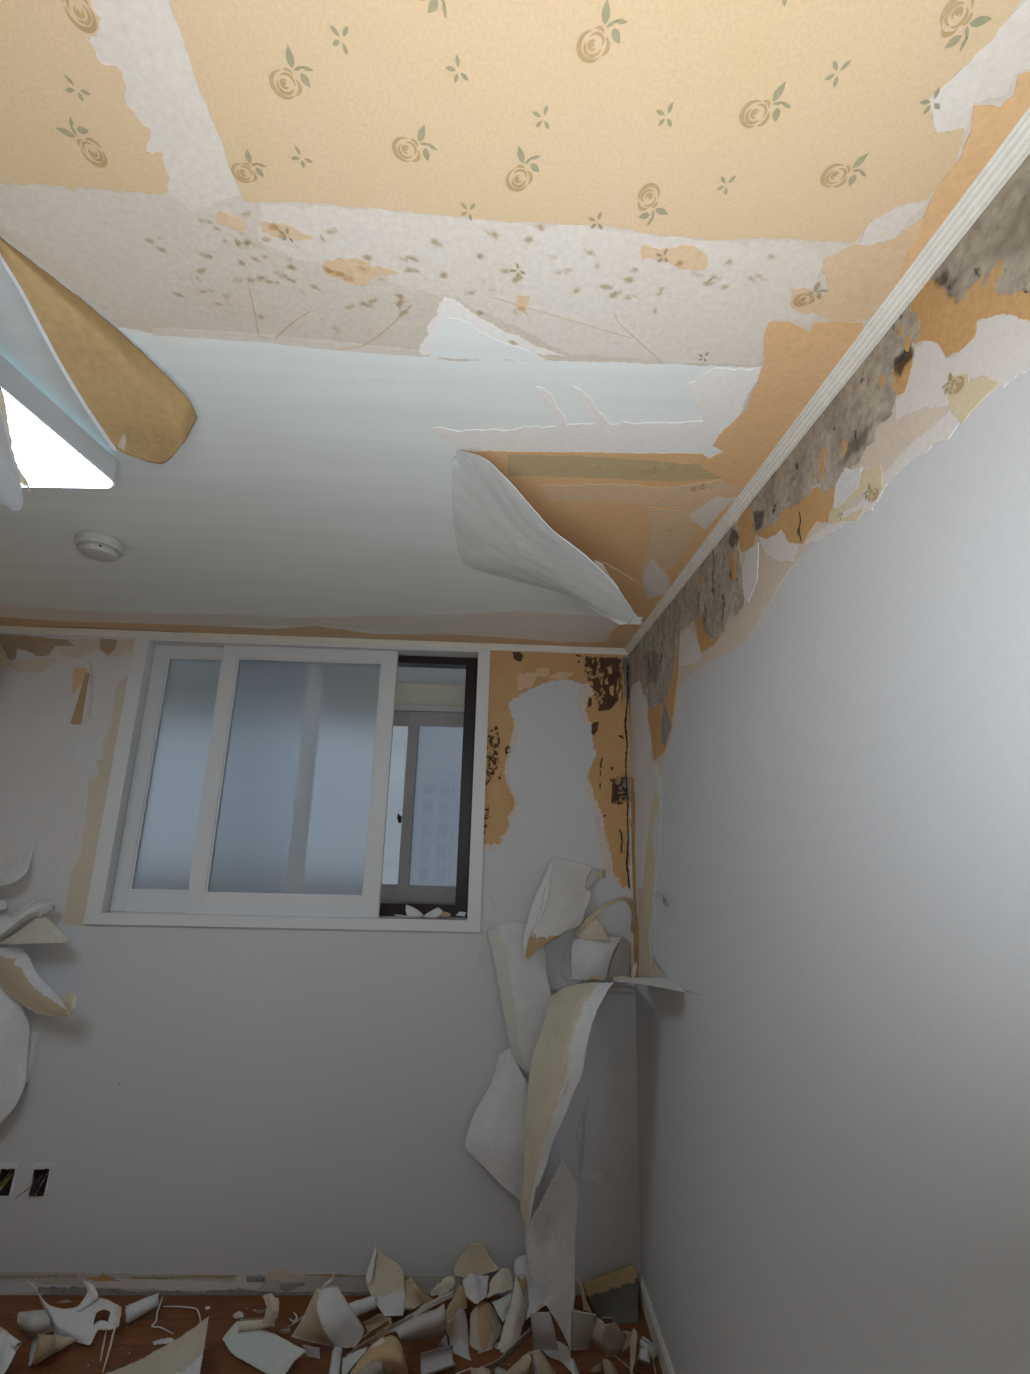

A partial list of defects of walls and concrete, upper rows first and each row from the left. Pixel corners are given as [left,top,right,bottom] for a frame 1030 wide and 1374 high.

spalling [930,154,1030,305]
peeling [0,302,920,746]
peeling [631,763,663,977]
peeling [0,1269,371,1295]
peeling [404,1275,464,1295]